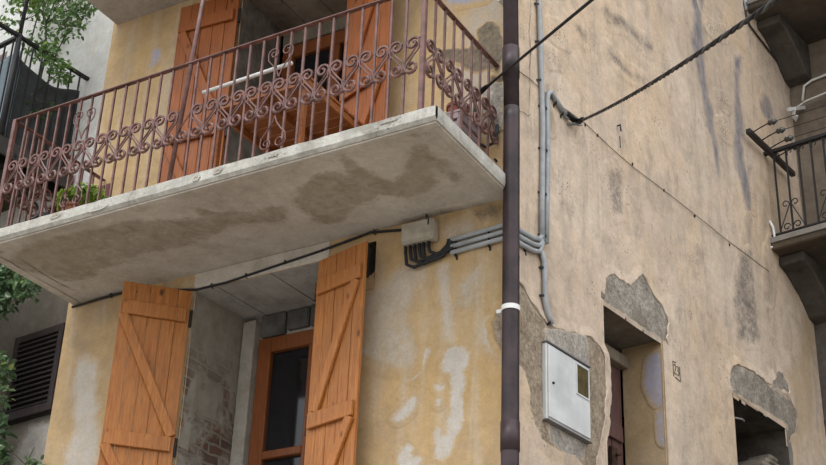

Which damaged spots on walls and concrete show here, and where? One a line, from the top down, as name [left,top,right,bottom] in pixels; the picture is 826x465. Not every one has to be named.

peeling [439,0,503,148]
water stain [1,128,470,285]
water stain [601,155,629,226]
water stain [687,0,780,352]
water stain [361,196,498,381]
peeling [386,340,475,465]
flaking render [485,299,502,362]
flaking render [519,274,612,465]
flaking render [598,264,673,450]
peeling [725,300,818,454]